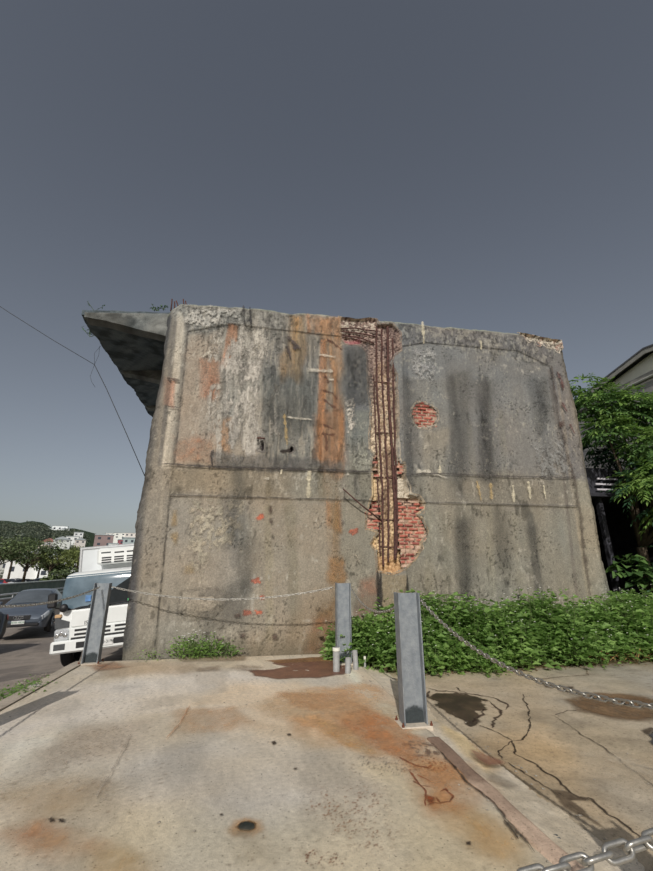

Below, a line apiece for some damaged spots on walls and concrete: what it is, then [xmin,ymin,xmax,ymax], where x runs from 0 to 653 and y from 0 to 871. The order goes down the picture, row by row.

spalling [337,316,440,576]
damp [426,687,509,728]
damp [568,693,653,720]
corrosion [400,741,456,809]
crack [440,751,535,852]
crack [480,694,653,837]